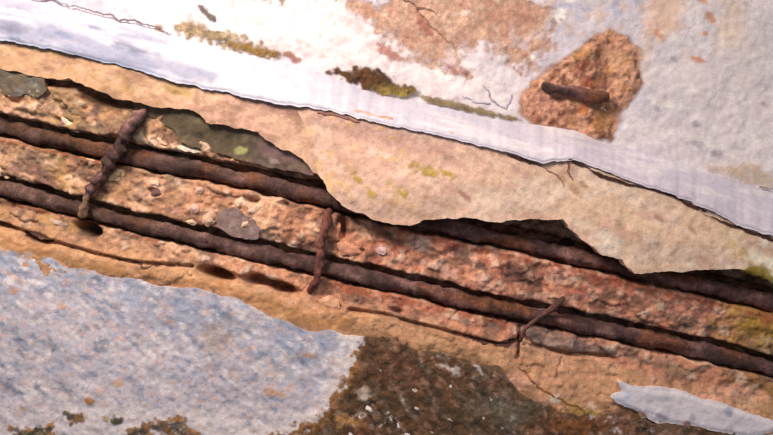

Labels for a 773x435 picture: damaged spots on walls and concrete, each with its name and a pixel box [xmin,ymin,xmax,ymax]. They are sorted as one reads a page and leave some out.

crack [403,0,455,50]
peeling [346,0,643,140]
spalling [0,69,327,189]
spalling [0,133,773,423]
leakage [8,423,55,435]
leakage [63,411,85,426]
leakage [103,415,201,435]
leakage [269,336,718,435]